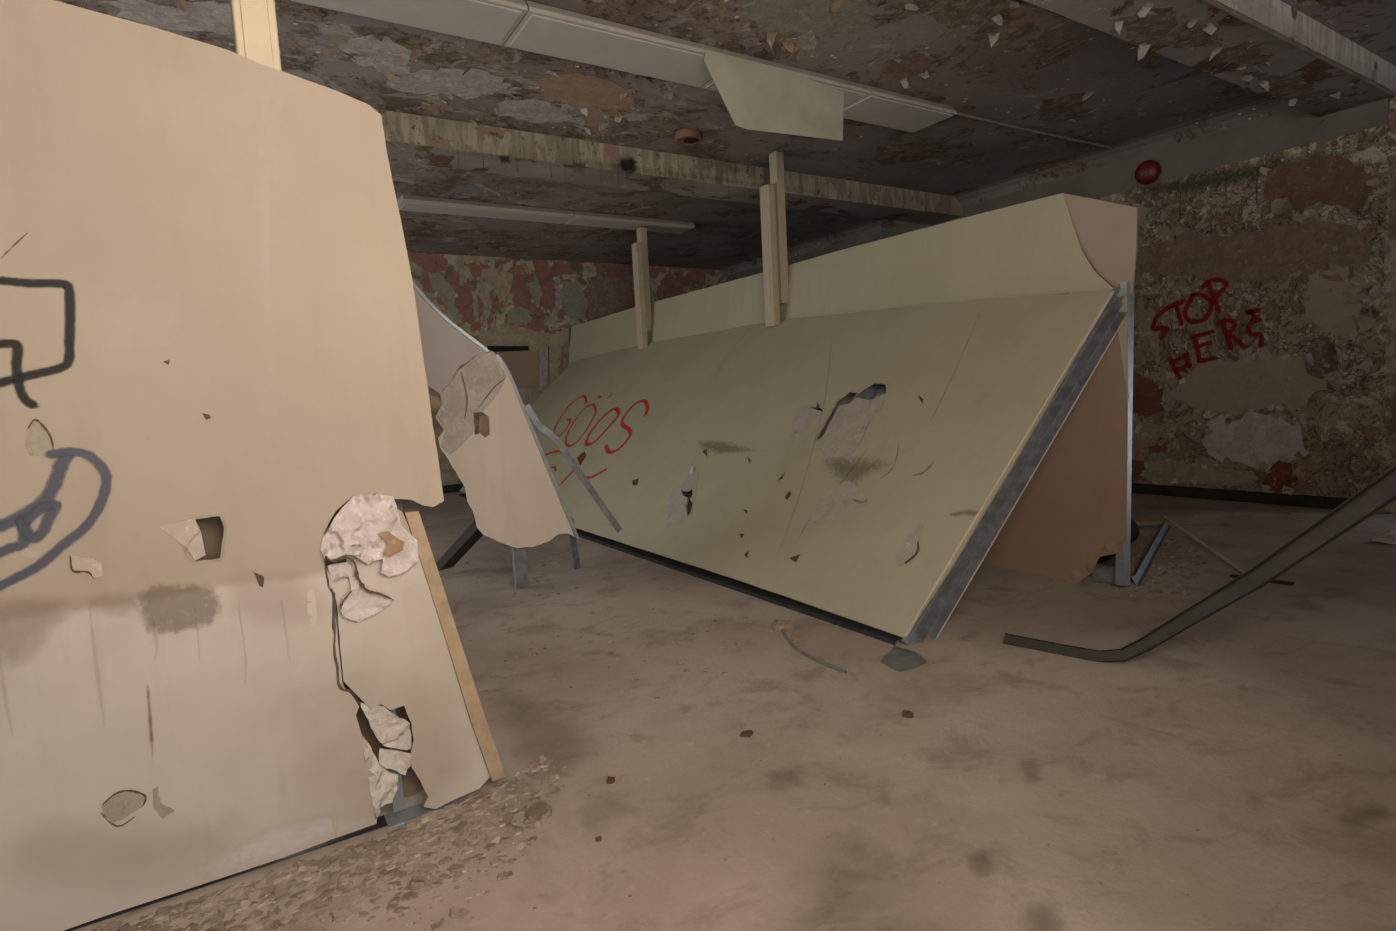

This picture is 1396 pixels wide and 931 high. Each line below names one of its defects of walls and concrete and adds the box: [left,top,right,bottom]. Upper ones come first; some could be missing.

peeling [90,0,234,37]
peeling [339,34,685,142]
peeling [881,52,934,89]
peeling [904,0,1066,56]
peeling [1030,92,1099,124]
peeling [1105,3,1347,107]
peeling [1259,155,1380,218]
peeling [427,255,571,351]
peeling [587,273,634,320]
spalling [1122,244,1376,486]
crack [324,556,395,705]